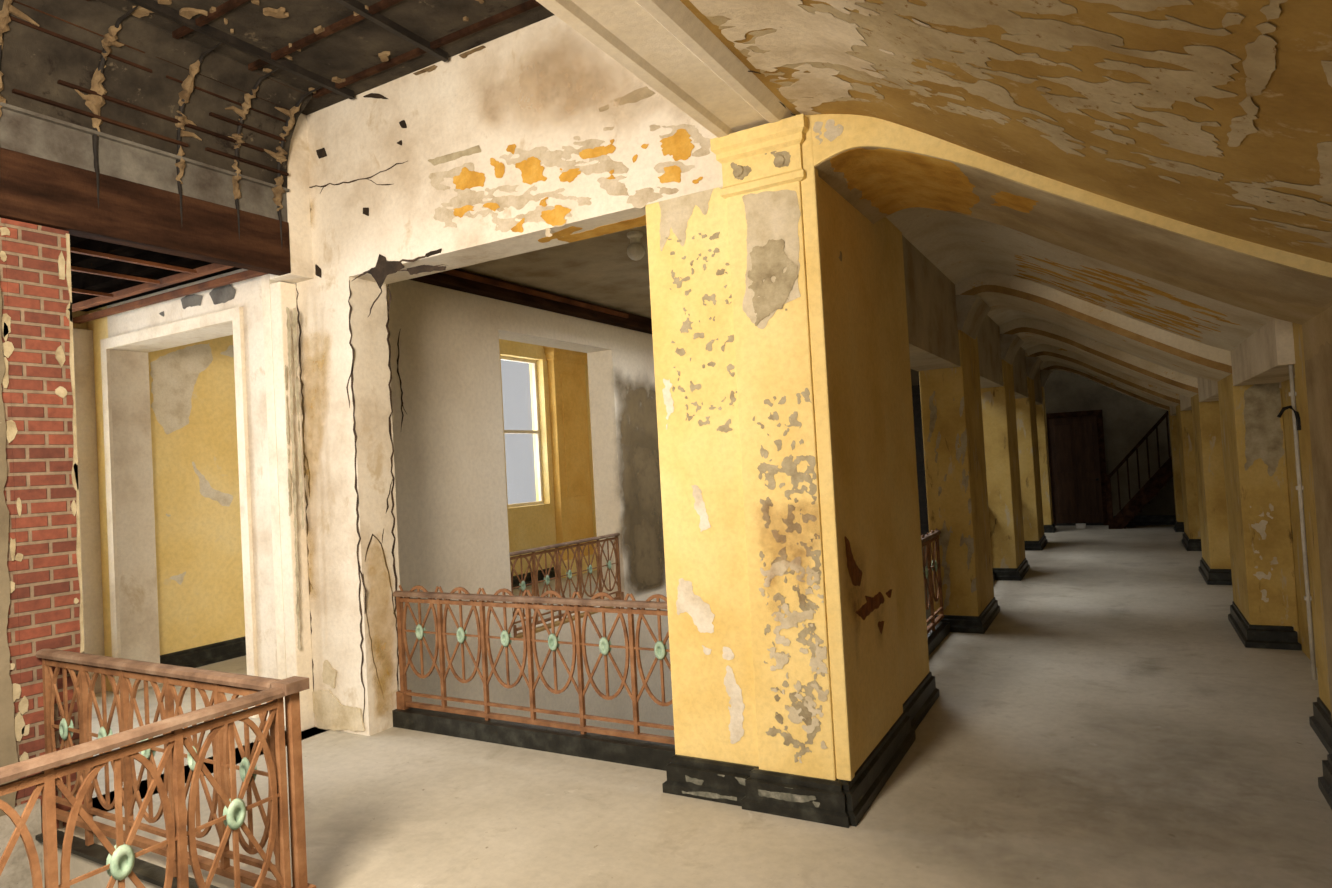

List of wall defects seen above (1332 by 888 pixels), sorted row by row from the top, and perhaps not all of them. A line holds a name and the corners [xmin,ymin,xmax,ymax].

peeling [689,0,1332,342]
flaking render [363,248,446,288]
peeling [428,86,801,433]
peeling [692,485,711,532]
peeling [676,578,745,744]
peeling [752,388,829,763]
peeling [844,536,892,634]
peeling [927,391,977,610]
peeling [1243,383,1285,476]
peeling [1250,504,1278,602]
peeling [1305,342,1332,712]